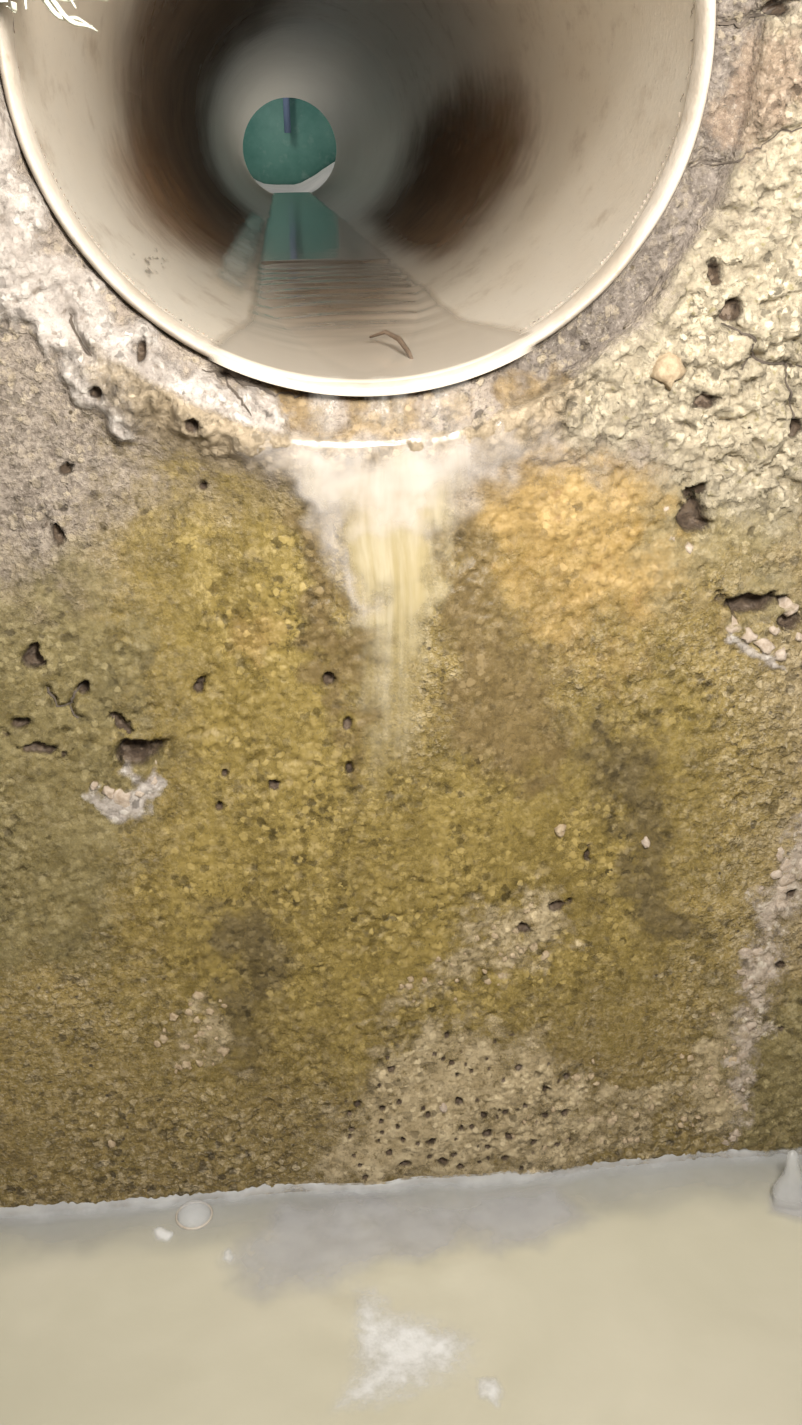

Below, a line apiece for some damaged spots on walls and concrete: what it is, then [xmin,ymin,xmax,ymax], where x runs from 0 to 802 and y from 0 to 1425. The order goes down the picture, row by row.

crack [690,0,787,41]
crack [687,127,802,168]
leakage [287,507,371,713]
spalling [714,591,802,670]
leakage [427,516,691,936]
leakage [209,914,286,1046]
leakage [722,814,802,1157]